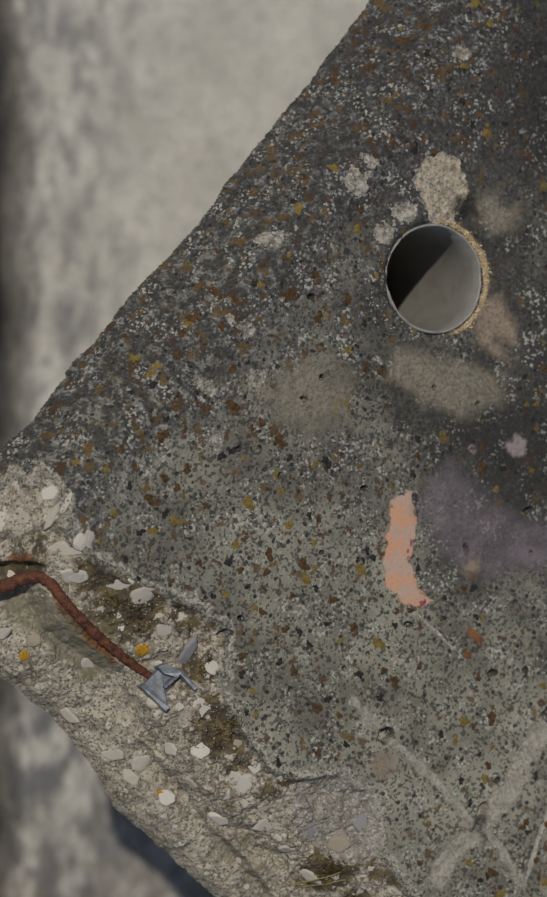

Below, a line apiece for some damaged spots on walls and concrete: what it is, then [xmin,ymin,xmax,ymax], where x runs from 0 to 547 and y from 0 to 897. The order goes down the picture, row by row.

spalling [0,468,418,897]
peeling [382,490,433,606]